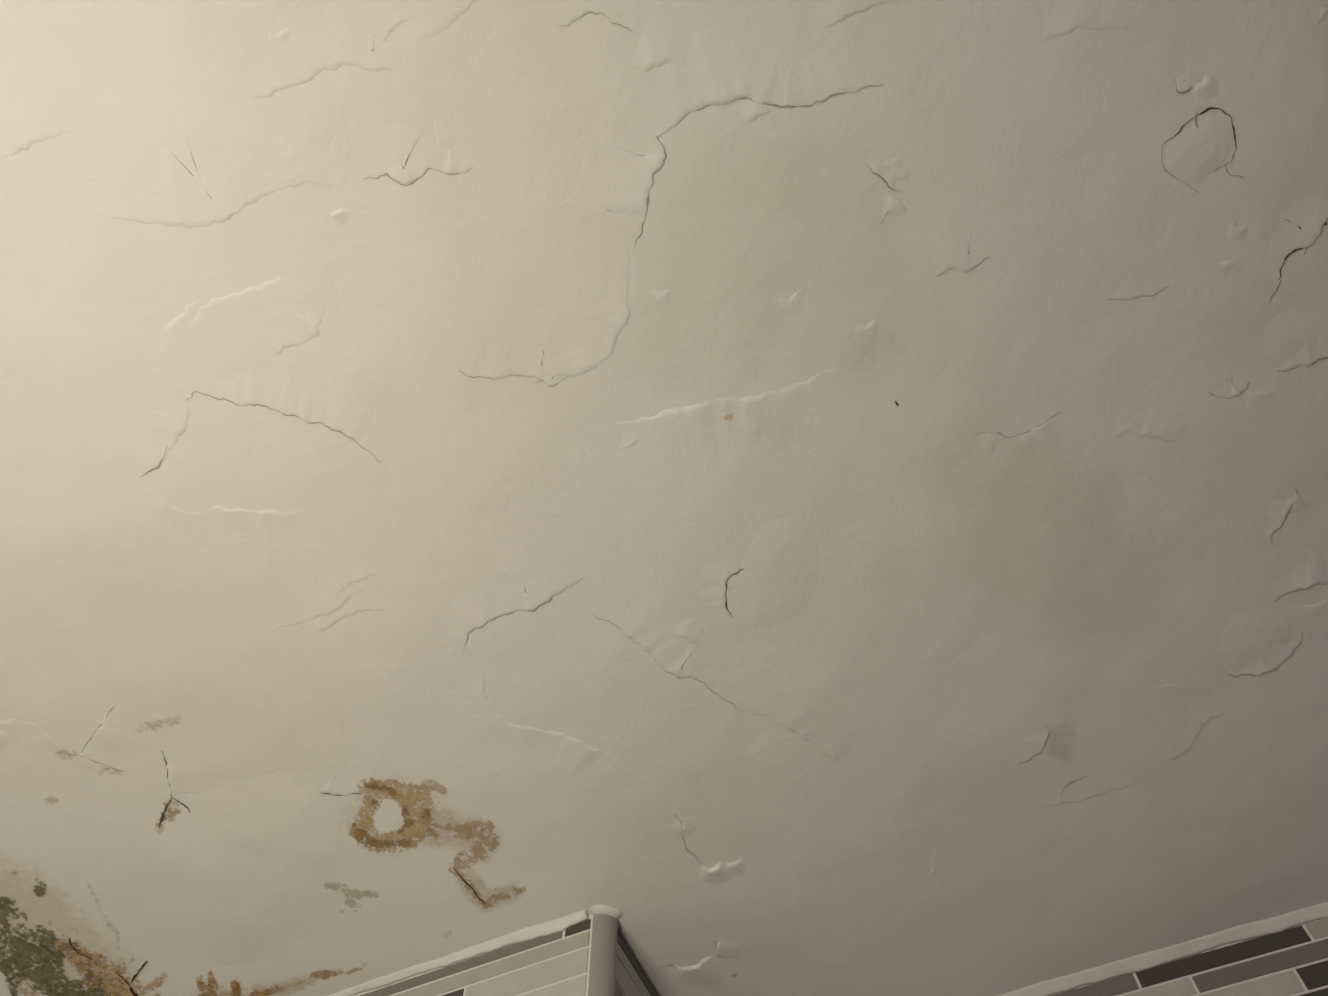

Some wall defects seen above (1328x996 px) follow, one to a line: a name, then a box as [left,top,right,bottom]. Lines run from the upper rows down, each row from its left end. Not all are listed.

crack [1266,190,1328,302]
water stain [0,896,162,996]